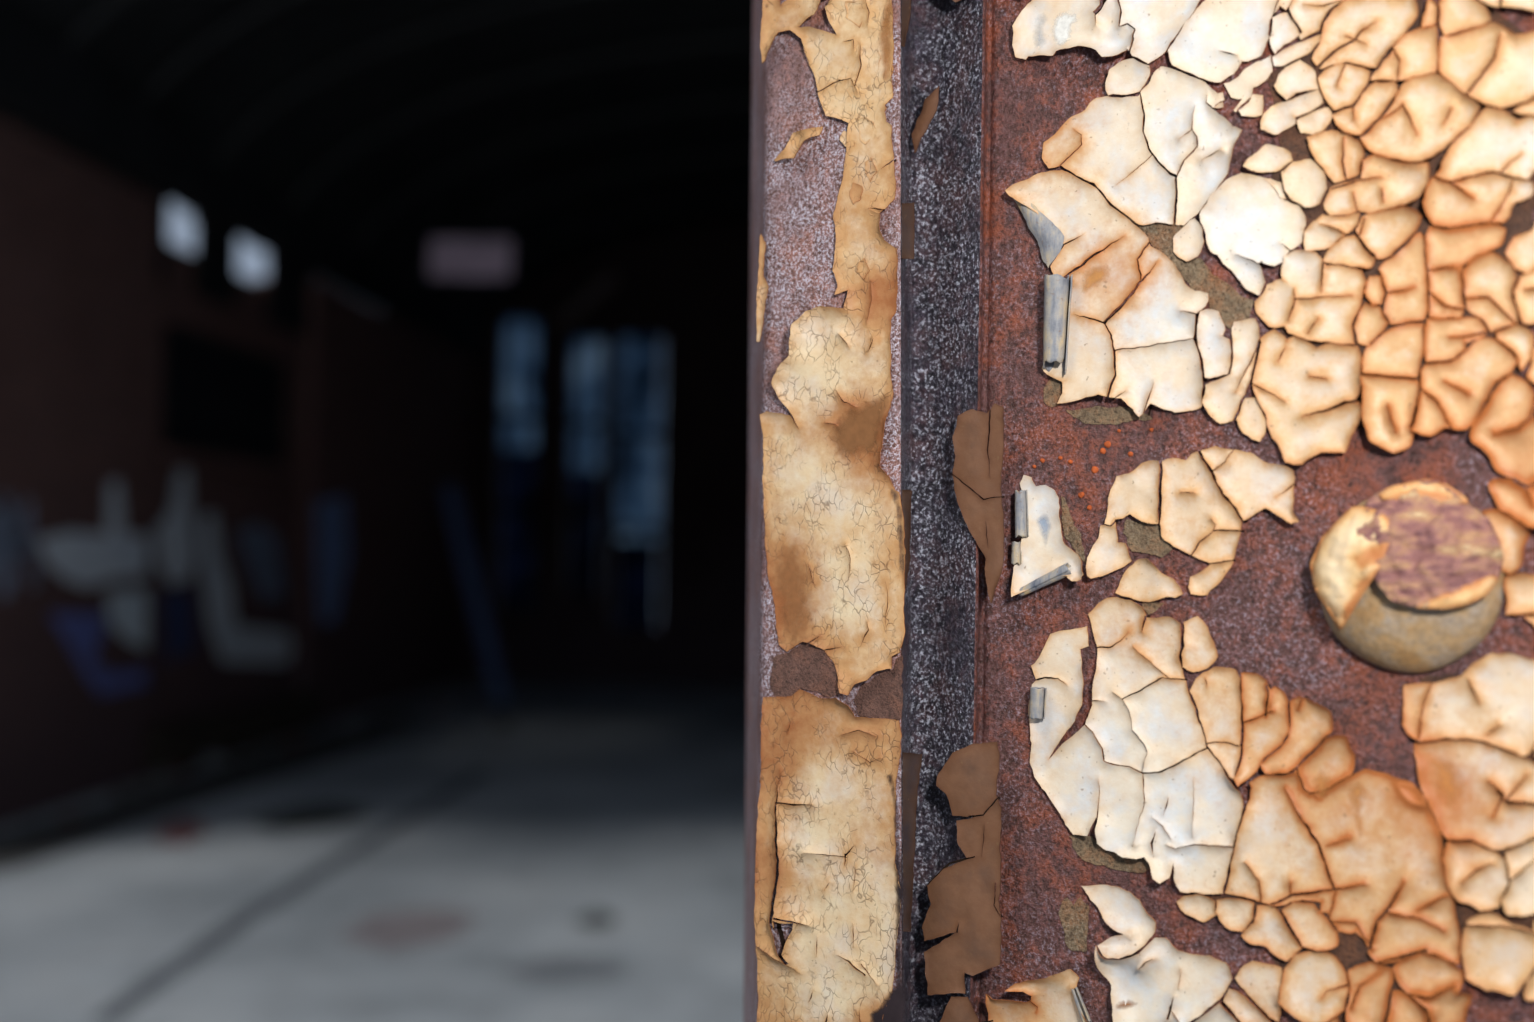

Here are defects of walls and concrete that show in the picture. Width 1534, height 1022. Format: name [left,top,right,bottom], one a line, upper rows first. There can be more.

crack [1066,0,1199,355]
corrosion [1084,269,1104,288]
crack [1253,341,1279,398]
peeling [754,0,1092,1022]
corrosion [1091,429,1121,474]
crack [1185,449,1247,564]
peeling [952,0,1534,1022]
corrosion [1357,481,1504,609]
crack [1094,677,1207,701]
crack [1098,685,1307,807]
crack [1303,773,1355,884]
crack [776,918,786,960]